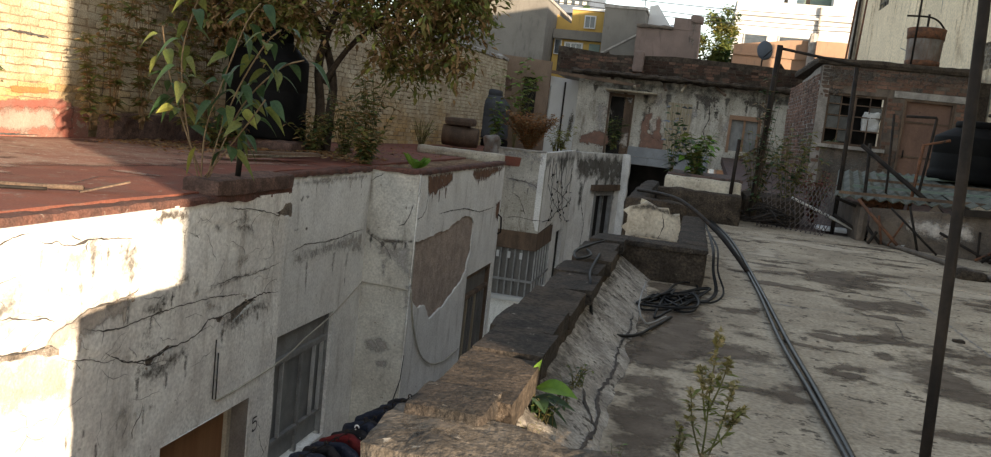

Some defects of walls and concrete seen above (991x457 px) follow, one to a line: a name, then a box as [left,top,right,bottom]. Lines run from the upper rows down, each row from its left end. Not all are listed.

peeling [579,130,628,147]
peeling [639,113,669,150]
flaking render [428,172,453,198]
crack [399,158,585,242]
peeling [411,216,473,318]
crack [0,208,391,450]
crack [579,313,634,449]